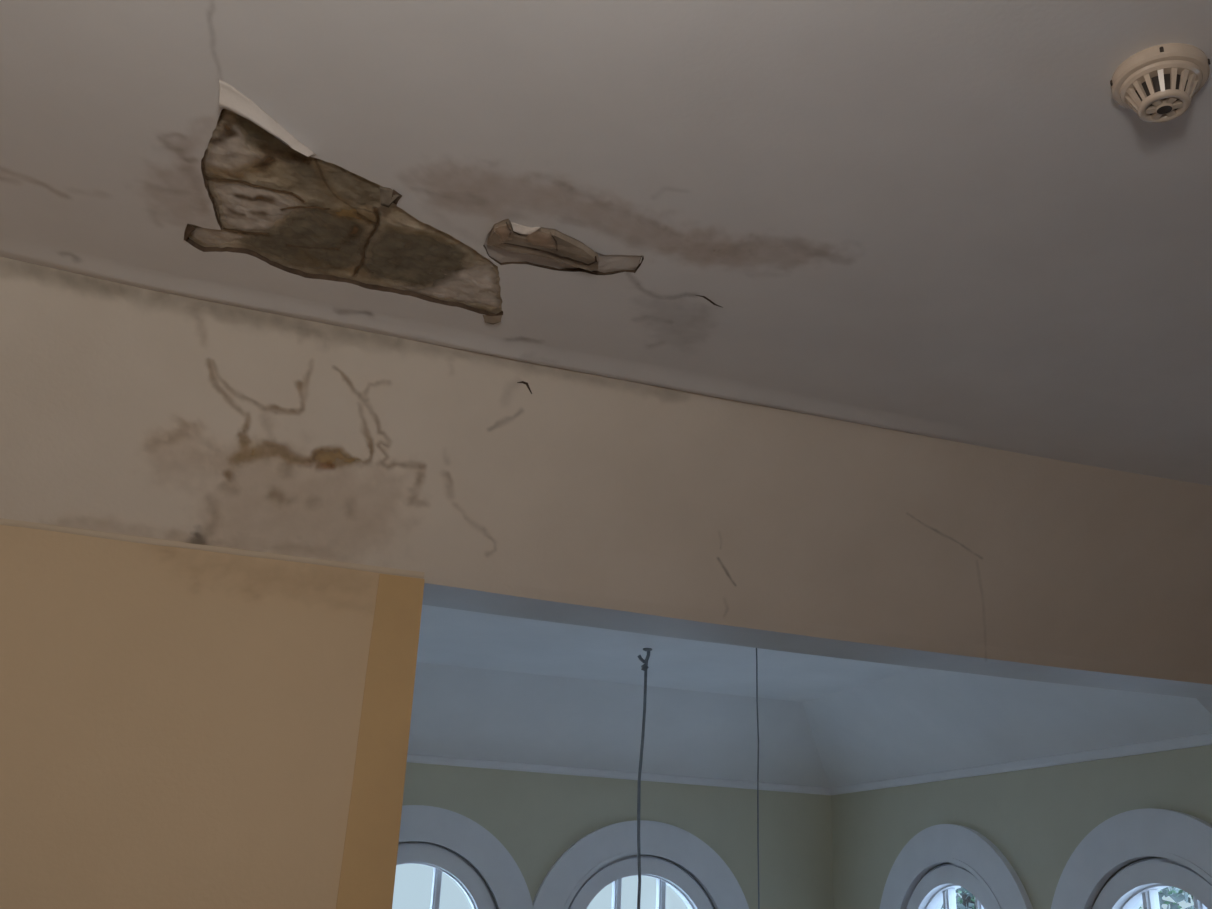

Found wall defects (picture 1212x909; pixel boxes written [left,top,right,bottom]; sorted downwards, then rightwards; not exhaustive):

peeling [219,79,316,157]
peeling [380,187,402,208]
peeling [511,222,541,235]
damp [314,450,372,465]